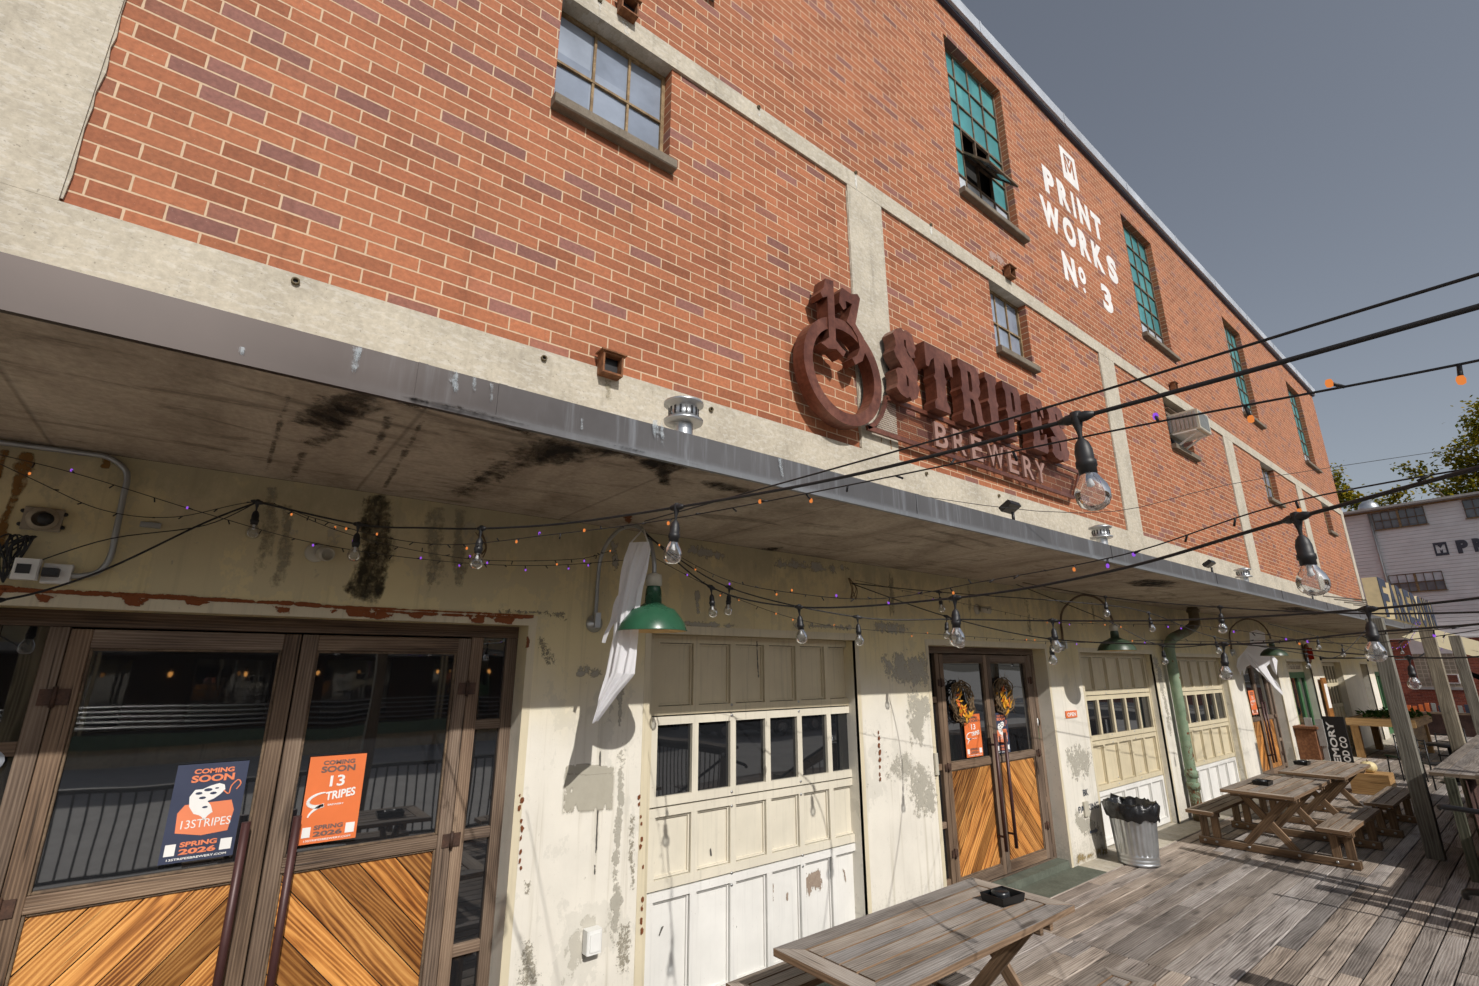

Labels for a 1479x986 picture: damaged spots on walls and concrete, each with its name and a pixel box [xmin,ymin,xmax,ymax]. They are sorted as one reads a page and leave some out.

corrosion [0,450,34,546]
water stain [294,394,379,445]
water stain [402,398,688,493]
water stain [704,483,751,494]
water stain [345,495,391,602]
peeling [881,652,938,818]
spalling [564,751,624,943]
water stain [616,923,632,972]